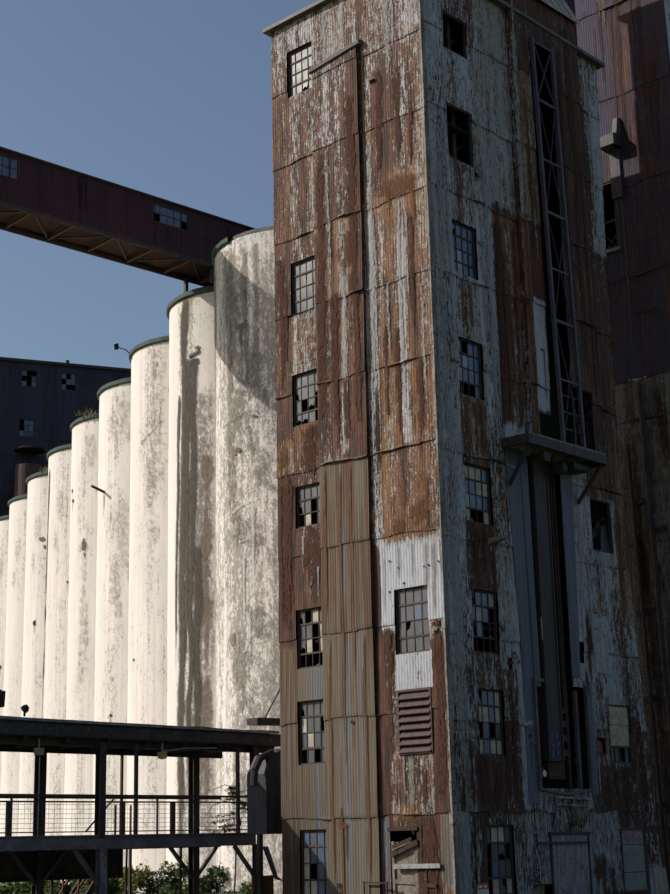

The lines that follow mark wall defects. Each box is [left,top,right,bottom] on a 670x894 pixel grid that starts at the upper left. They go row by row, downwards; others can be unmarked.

peeling [381,0,394,80]
damp [224,243,259,471]
rust [275,259,288,395]
rust [278,95,362,631]
peeling [324,160,348,394]
peeling [366,144,409,520]
rust [383,325,401,432]
rust [374,66,415,327]
damp [39,469,50,639]
damp [175,298,203,727]
damp [177,757,188,834]
rust [432,634,449,799]